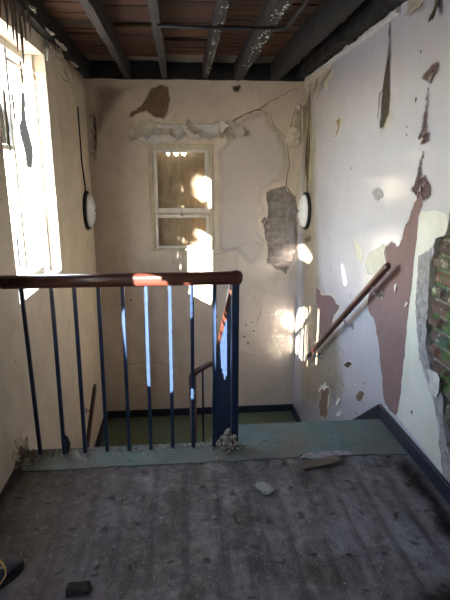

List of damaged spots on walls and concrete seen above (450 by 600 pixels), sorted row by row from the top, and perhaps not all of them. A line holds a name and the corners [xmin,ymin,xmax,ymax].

peeling [127,82,245,144]
crack [233,89,295,197]
flaking render [257,185,299,276]
peeling [314,286,342,339]
peeling [353,190,450,481]
peeling [315,382,341,420]